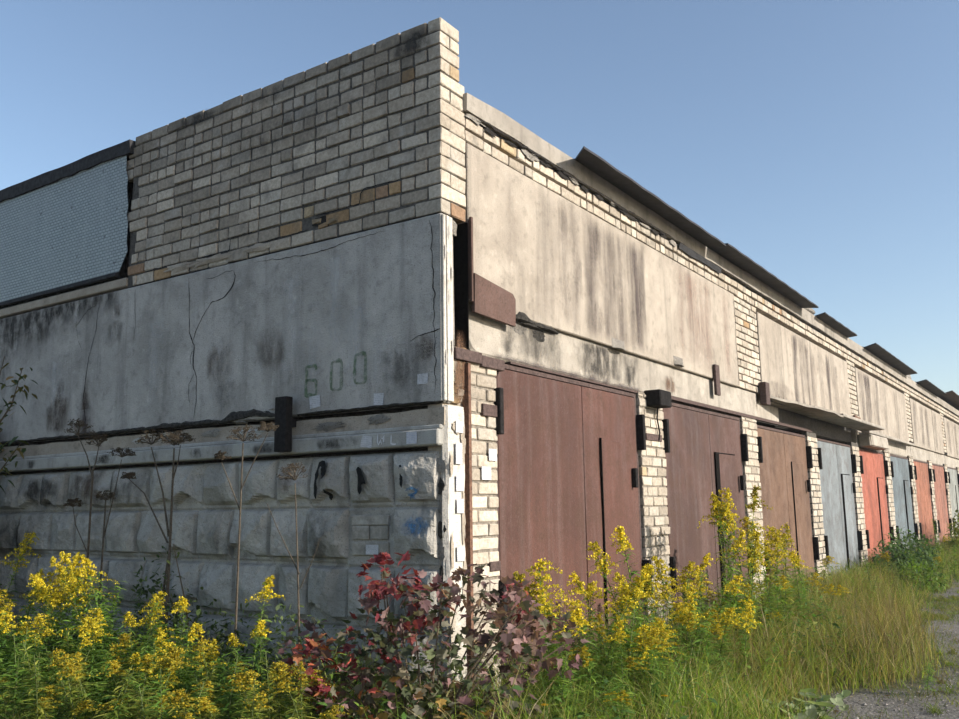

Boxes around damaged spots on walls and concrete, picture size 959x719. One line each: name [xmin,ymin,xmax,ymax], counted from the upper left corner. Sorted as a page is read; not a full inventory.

damp [0,293,113,344]
crack [188,230,388,419]
crack [411,221,441,392]
damp [559,344,639,391]
damp [632,250,642,342]